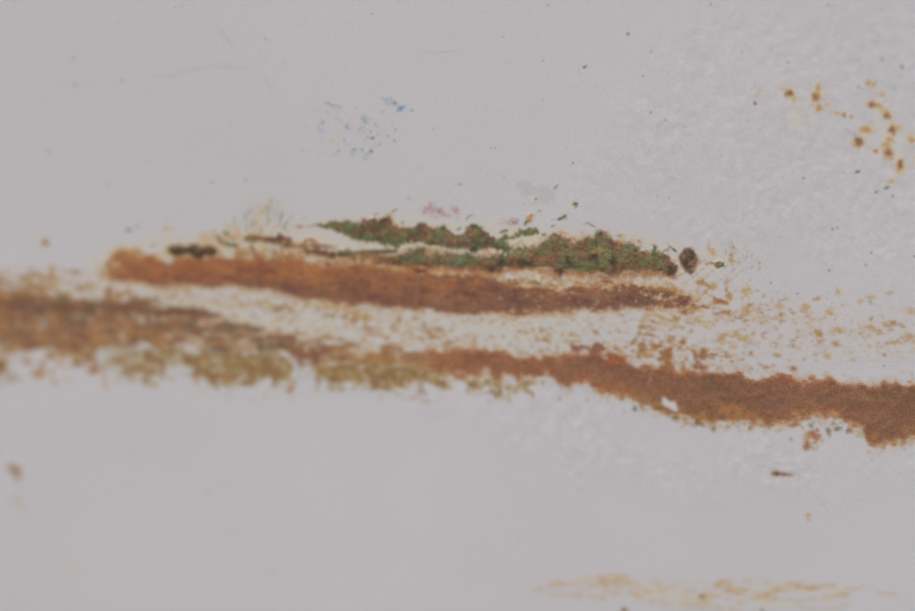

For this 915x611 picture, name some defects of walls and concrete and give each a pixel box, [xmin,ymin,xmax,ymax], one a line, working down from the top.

rust [750,77,915,185]
rust [0,208,915,460]